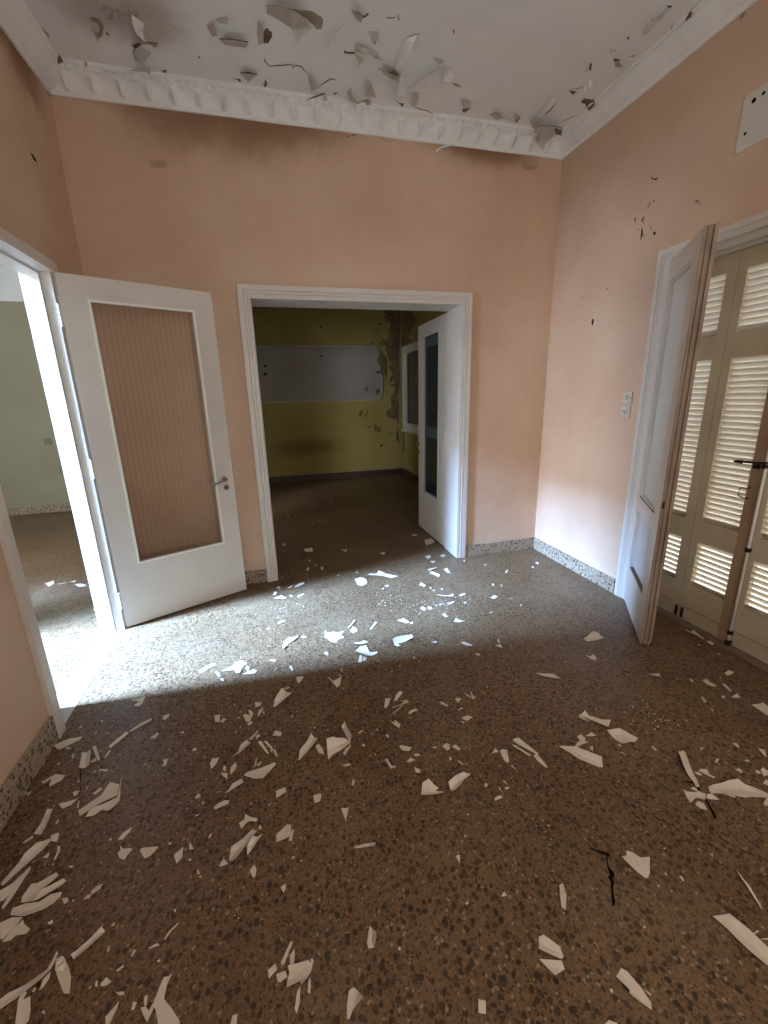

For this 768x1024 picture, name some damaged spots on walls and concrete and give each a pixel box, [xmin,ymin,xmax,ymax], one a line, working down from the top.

peeling [90,17,110,44]
peeling [128,14,167,73]
peeling [207,5,323,48]
peeling [344,9,398,81]
peeling [234,71,267,87]
peeling [264,59,376,105]
peeling [452,82,471,113]
peeling [489,63,595,149]
crack [681,781,717,819]
crack [592,848,616,906]